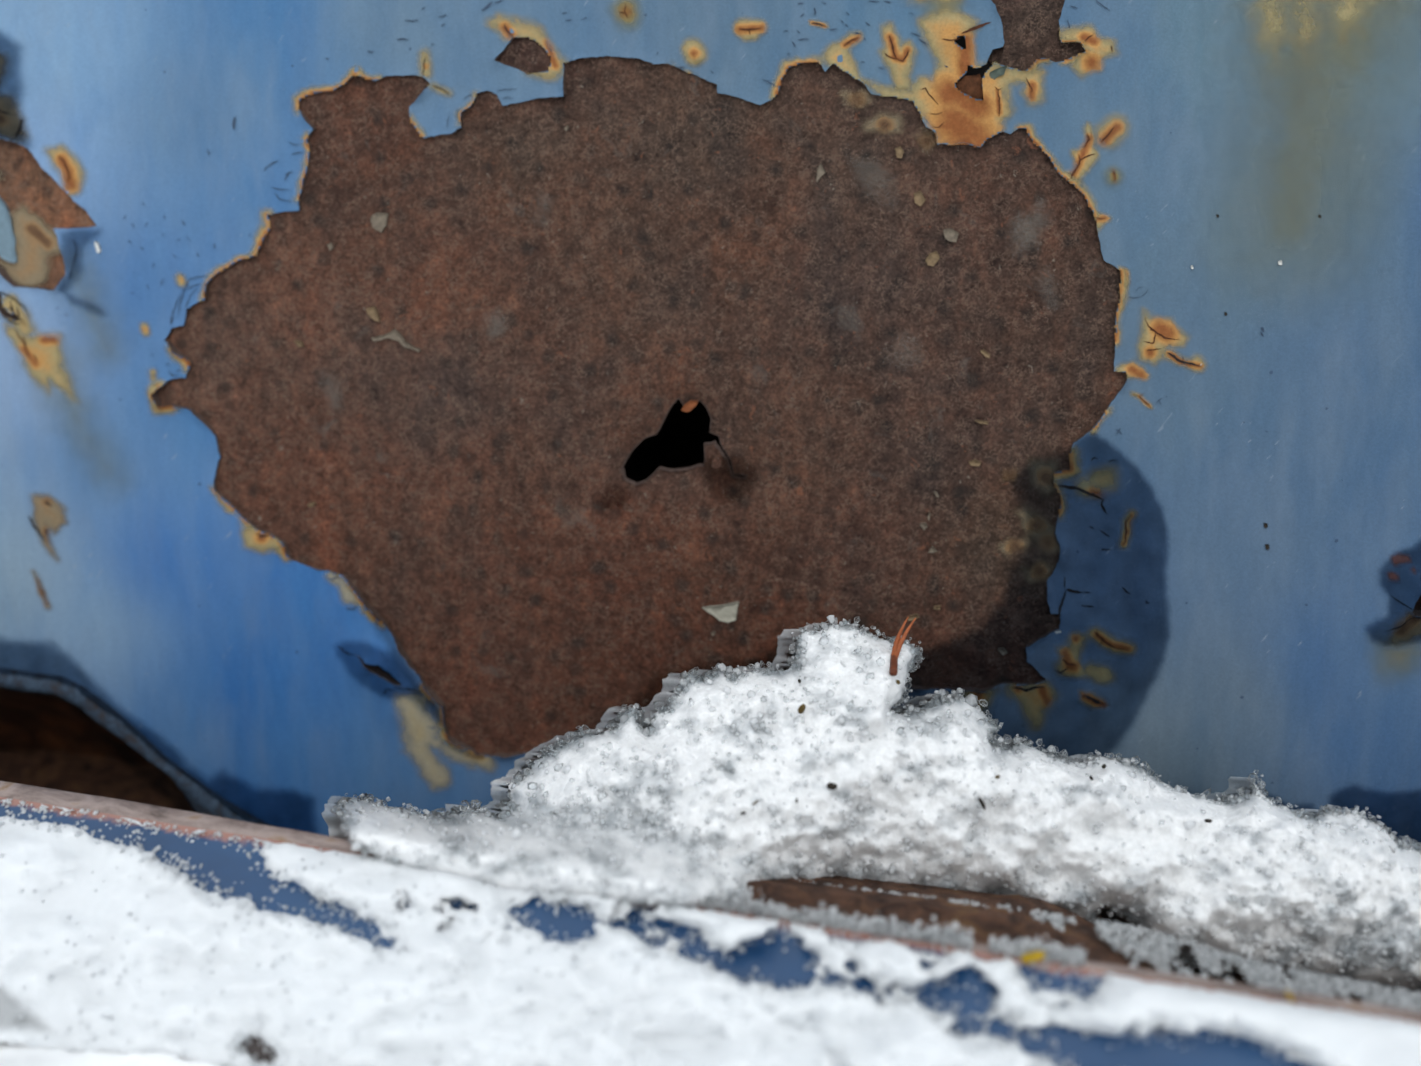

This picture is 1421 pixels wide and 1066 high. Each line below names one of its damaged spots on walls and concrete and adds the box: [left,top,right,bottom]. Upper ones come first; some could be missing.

rust [682,40,706,65]
rust [823,0,1045,147]
rust [1059,26,1115,75]
rust [47,145,83,195]
rust [1071,117,1126,180]
rust [2,295,72,396]
peeling [148,15,1127,757]
rust [1117,313,1205,409]
rust [242,527,281,552]
rust [325,572,358,610]
rust [963,628,1134,728]
rust [396,694,494,789]